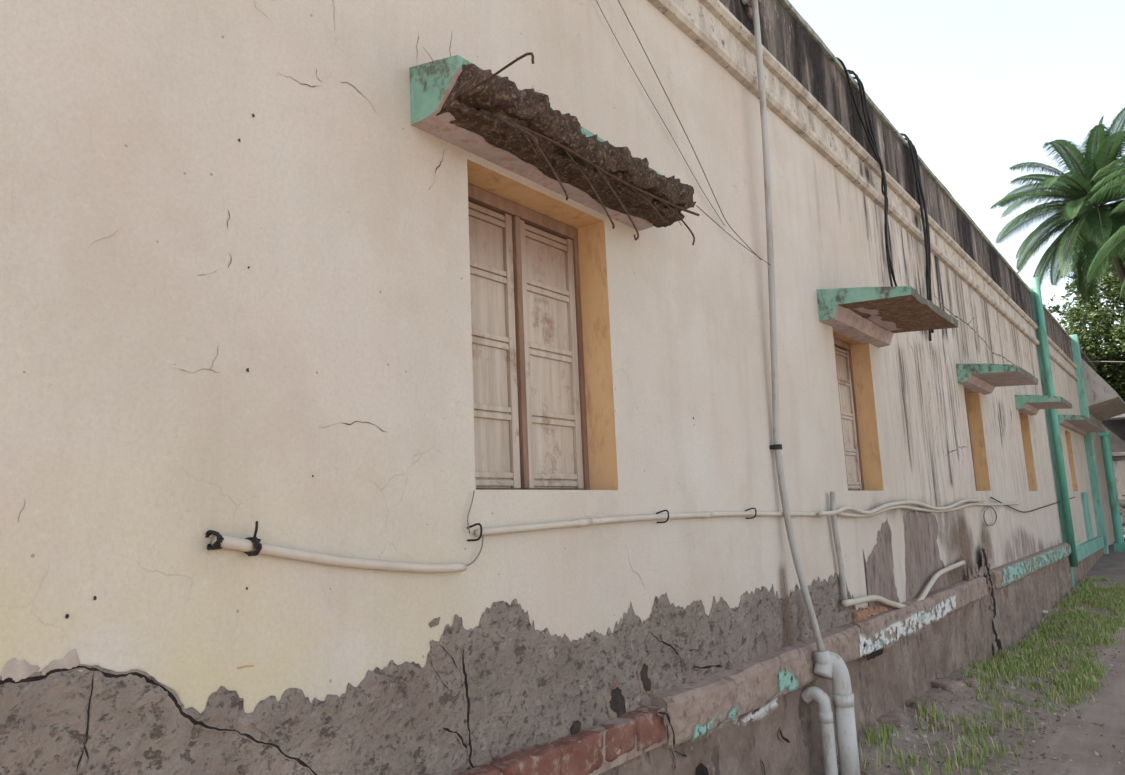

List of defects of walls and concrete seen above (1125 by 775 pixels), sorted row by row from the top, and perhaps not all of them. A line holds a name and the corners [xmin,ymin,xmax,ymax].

spalling [435,52,699,245]
peeling [0,510,971,775]
crack [968,542,1005,655]
crack [0,664,323,775]
crack [431,645,479,769]